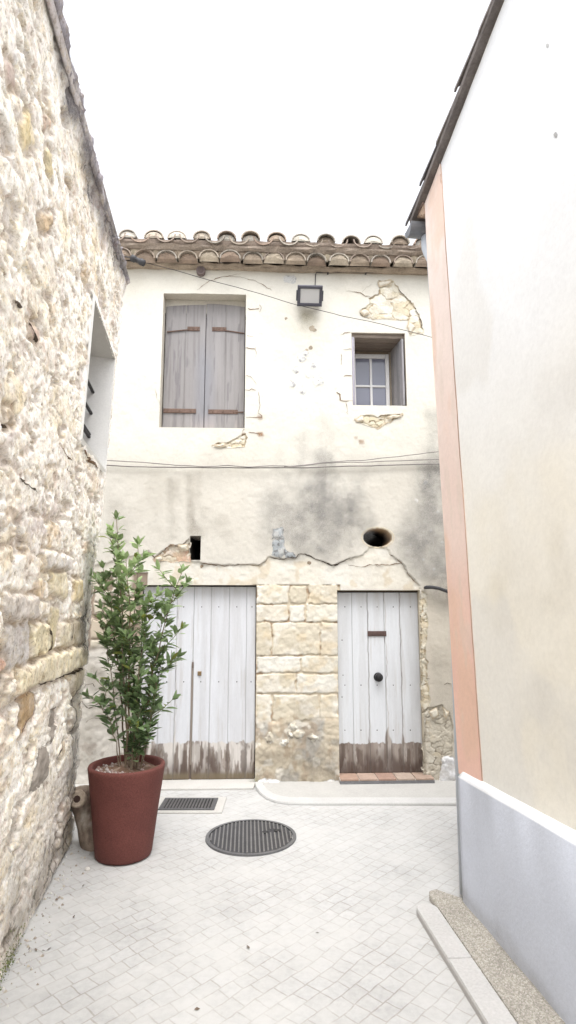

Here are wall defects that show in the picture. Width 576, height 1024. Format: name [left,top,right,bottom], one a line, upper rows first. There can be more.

flaking render [359,279,424,336]
flaking render [354,413,404,430]
flaking render [212,433,248,448]
flaking render [153,542,203,568]
crack [202,554,418,584]
flaking render [419,591,454,780]